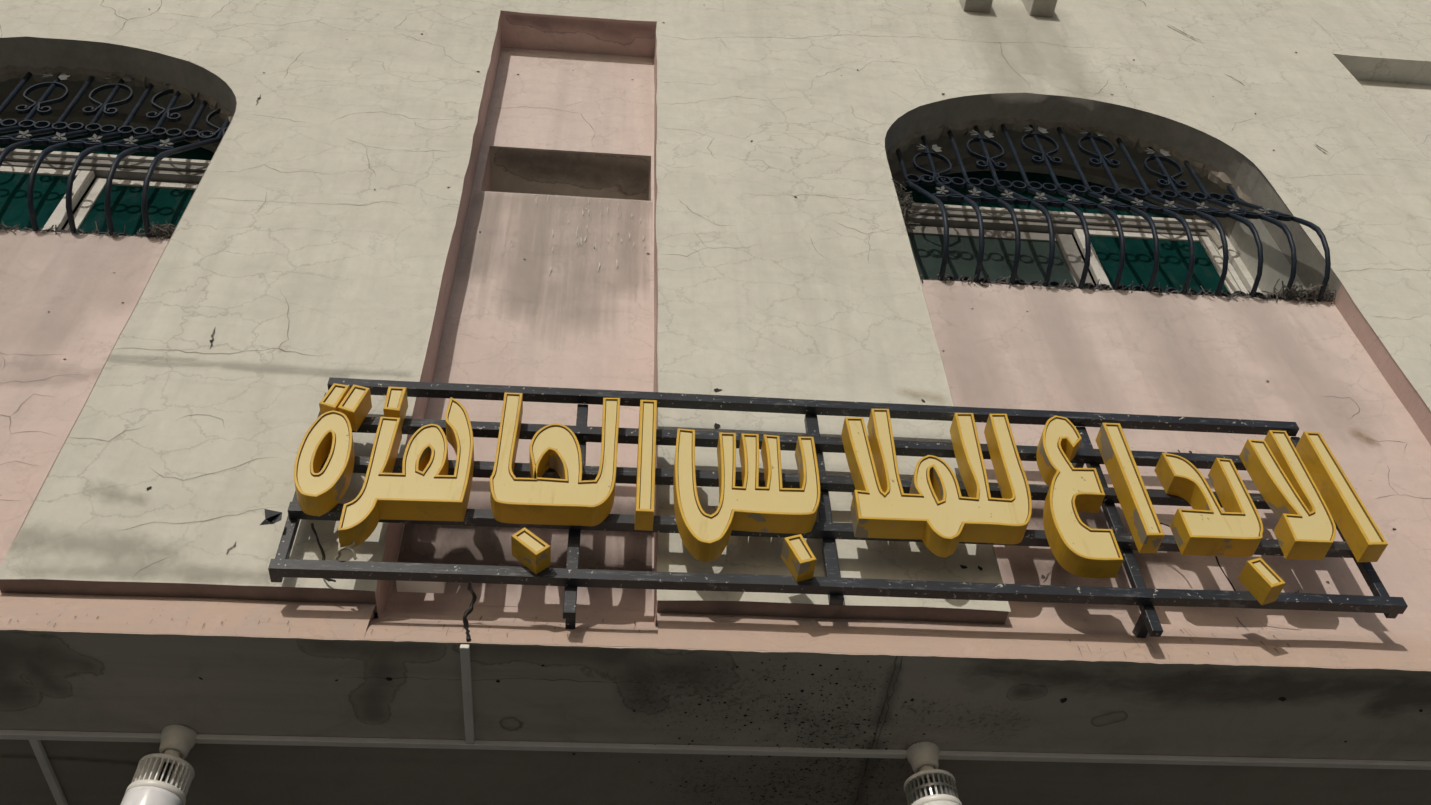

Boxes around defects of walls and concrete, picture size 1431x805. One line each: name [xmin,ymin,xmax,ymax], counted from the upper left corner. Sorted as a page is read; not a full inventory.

leakage [650,657,949,805]